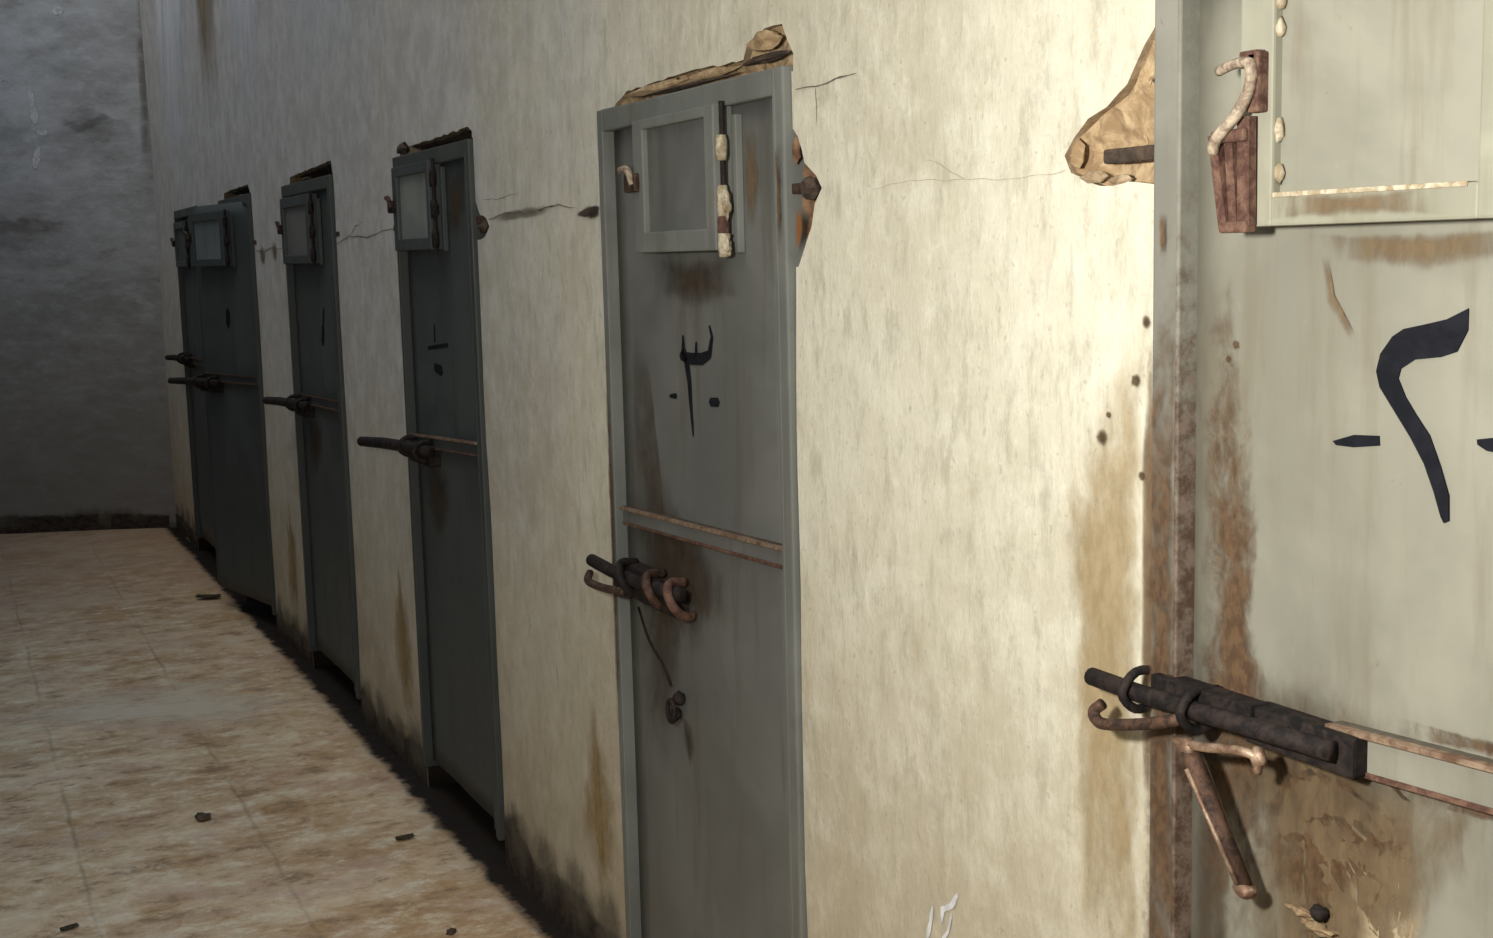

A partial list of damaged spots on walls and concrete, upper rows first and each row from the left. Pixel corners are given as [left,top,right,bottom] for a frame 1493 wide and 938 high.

spalling [621,26,793,105]
crack [796,73,856,117]
spalling [1070,41,1155,186]
crack [484,194,575,220]
spalling [792,137,822,246]
leakage [0,508,198,550]
corrosion [1146,389,1172,683]
corrosion [1146,708,1173,938]